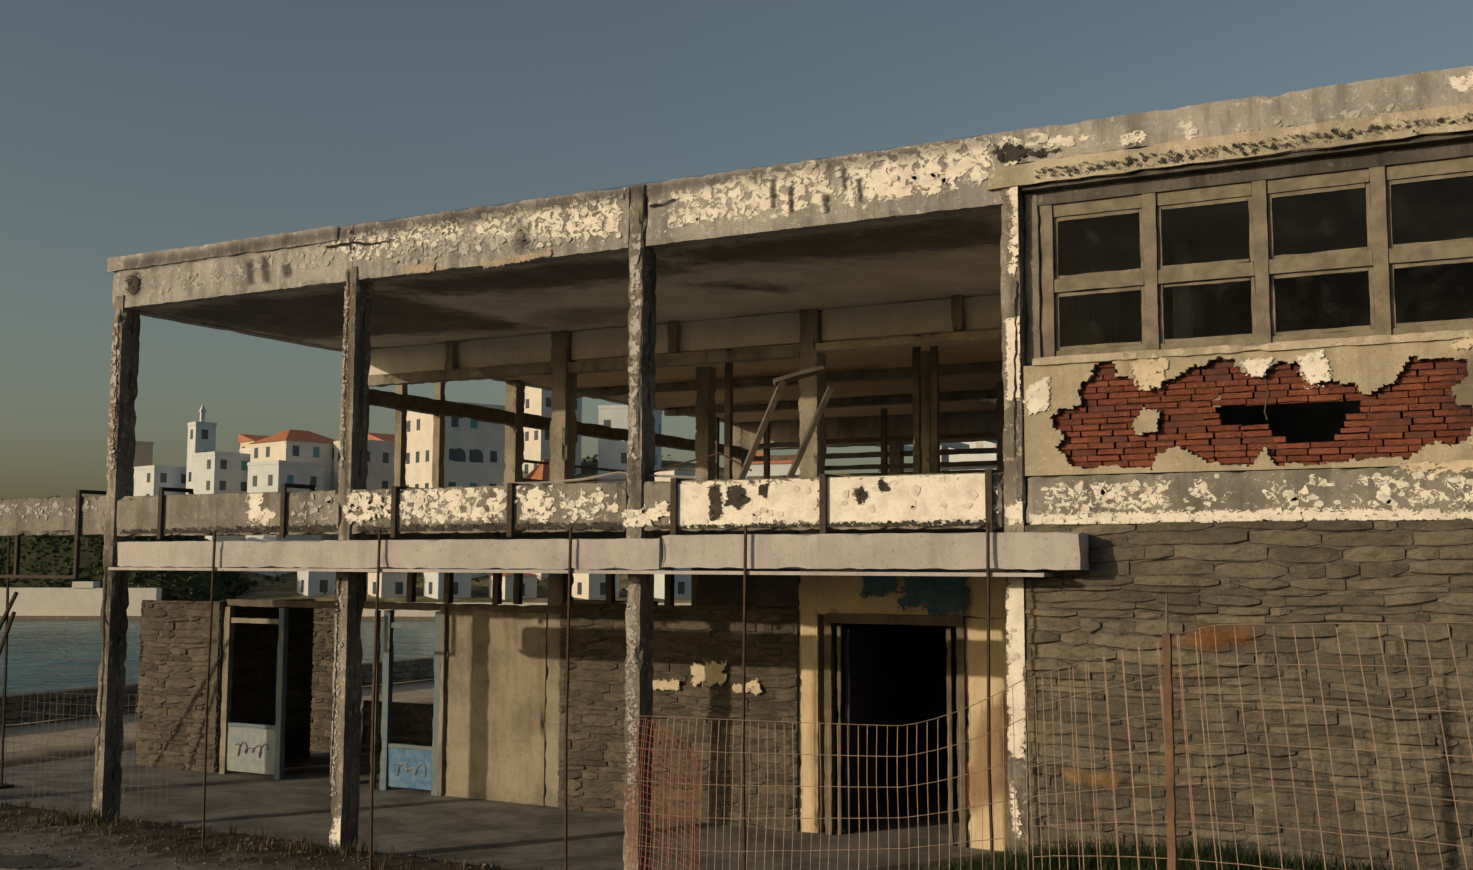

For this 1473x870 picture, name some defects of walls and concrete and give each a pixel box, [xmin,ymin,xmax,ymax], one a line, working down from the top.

peeling [1449,71,1473,93]
spalling [124,271,141,296]
peeling [159,187,641,467]
peeling [1005,186,1019,276]
peeling [659,103,1473,233]
flaking render [118,316,1473,534]